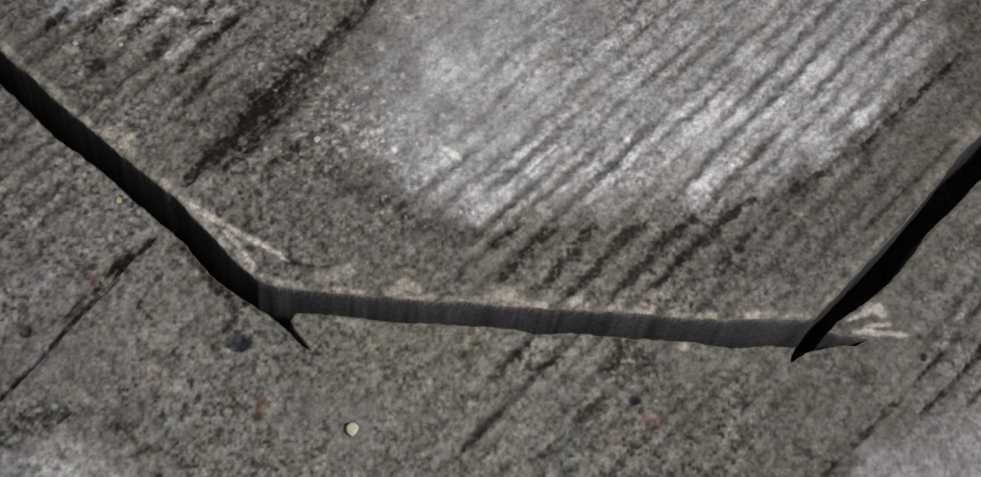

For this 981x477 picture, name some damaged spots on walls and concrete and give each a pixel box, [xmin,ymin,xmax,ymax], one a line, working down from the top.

crack [184,0,375,184]
crack [860,56,957,150]
crack [789,171,824,194]
crack [0,239,154,399]
crack [918,345,981,414]
crack [851,402,896,447]
crack [822,462,836,477]